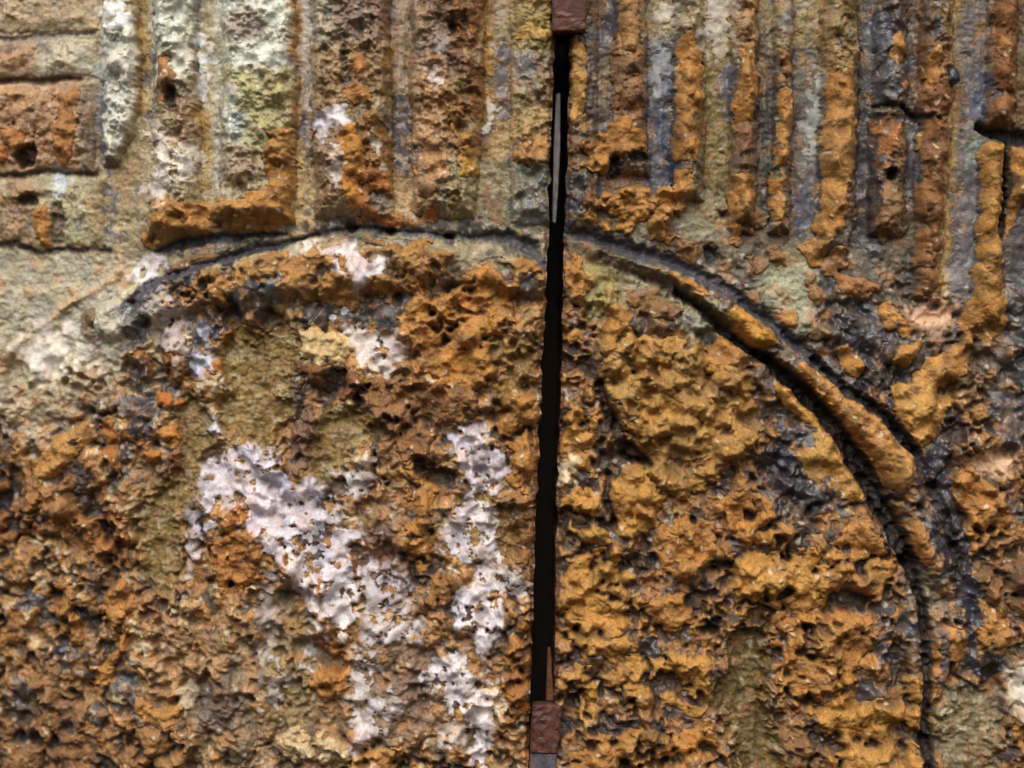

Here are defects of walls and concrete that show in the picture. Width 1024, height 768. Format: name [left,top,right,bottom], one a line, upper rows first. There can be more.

rust [0,576,97,768]
rust [0,420,135,686]
rust [118,678,201,768]
water stain [0,93,551,498]
water stain [177,404,438,761]
rust [275,725,404,768]
rust [140,104,550,622]
water stain [417,418,533,768]
rust [568,38,588,130]
rust [579,29,707,265]
rust [555,252,1024,768]
rust [726,0,1024,493]